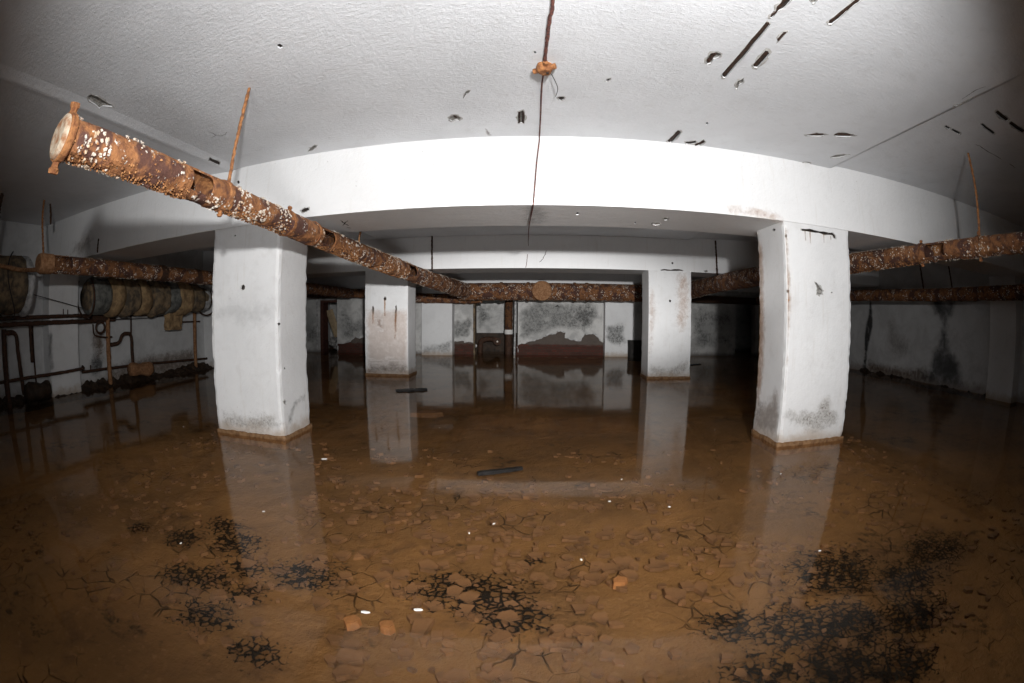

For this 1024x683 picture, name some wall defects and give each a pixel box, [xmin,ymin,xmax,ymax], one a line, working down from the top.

spalling [826,0,861,26]
spalling [704,0,792,90]
spalling [995,110,1024,133]
spalling [665,130,706,146]
water stain [523,304,593,335]
peeling [516,331,603,358]
water stain [864,301,958,382]